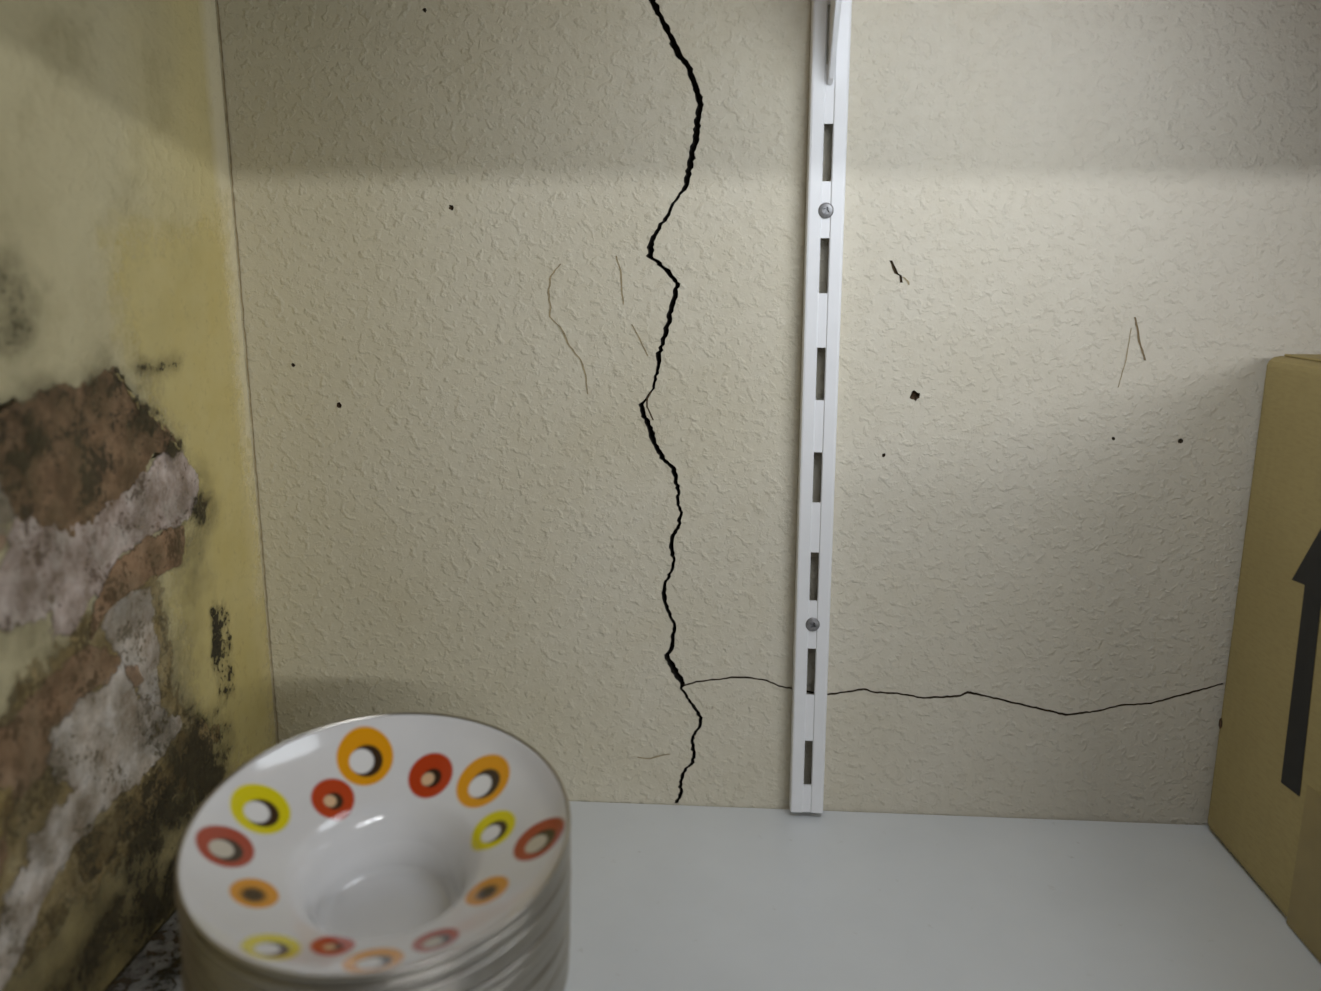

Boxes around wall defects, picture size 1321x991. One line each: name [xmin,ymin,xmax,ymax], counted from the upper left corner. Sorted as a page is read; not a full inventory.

peeling [0,366,221,991]
leakage [3,607,235,991]
leakage [88,371,182,458]
leakage [168,492,213,526]
crack [547,264,588,394]
crack [616,0,1222,802]